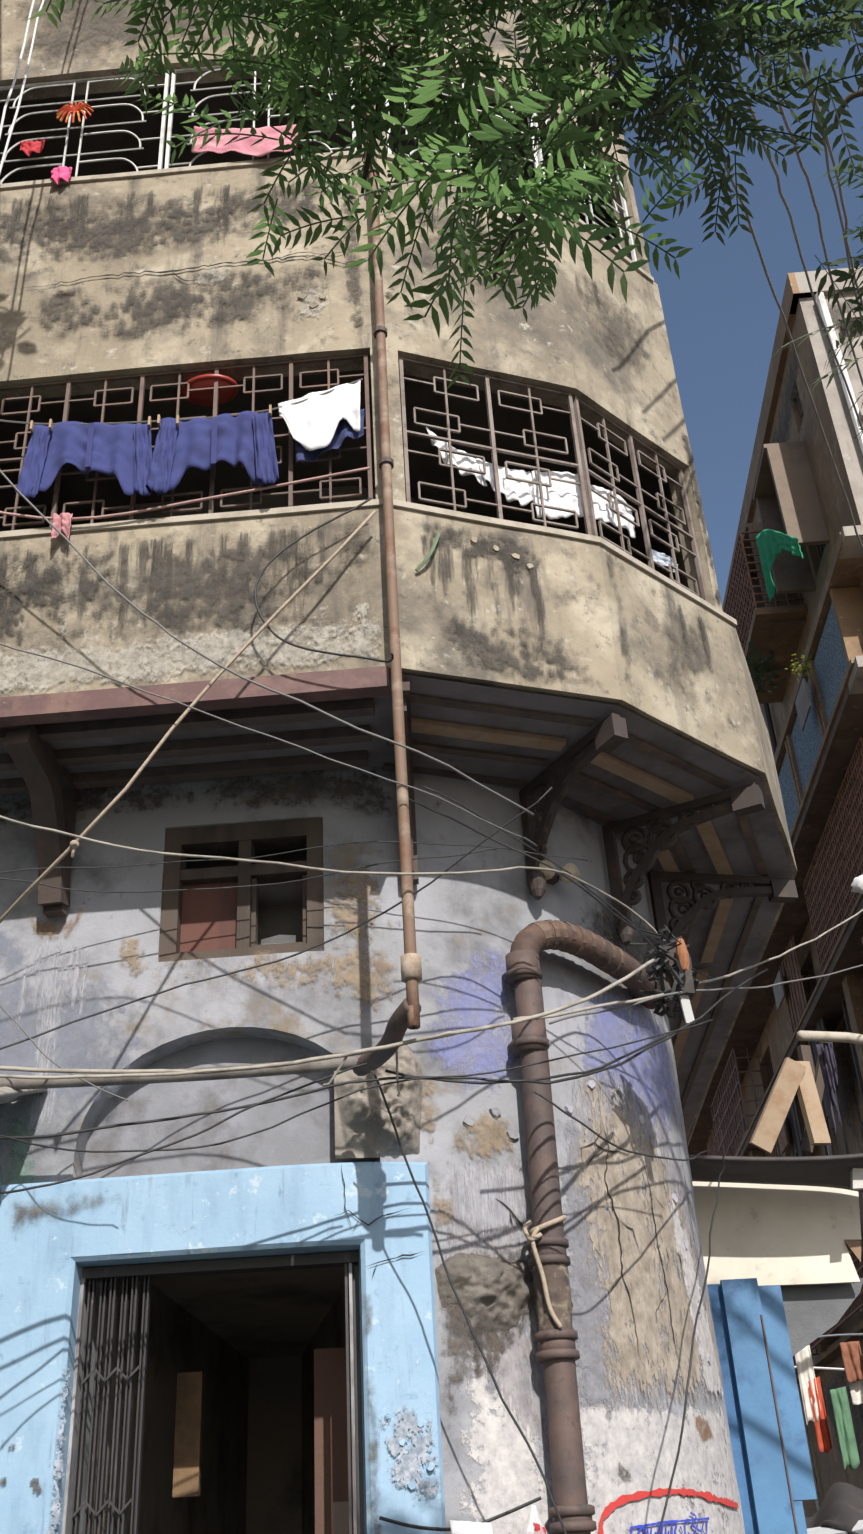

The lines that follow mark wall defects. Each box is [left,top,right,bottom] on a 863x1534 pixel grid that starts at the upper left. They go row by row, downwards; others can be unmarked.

damp [0,181,363,336]
damp [683,435,721,603]
damp [0,525,381,692]
damp [422,523,588,681]
damp [666,605,712,683]
crack [334,1165,410,1230]
crack [366,1251,423,1276]
peeling [456,1107,520,1157]
crack [581,1074,702,1373]
spalling [381,1406,439,1504]